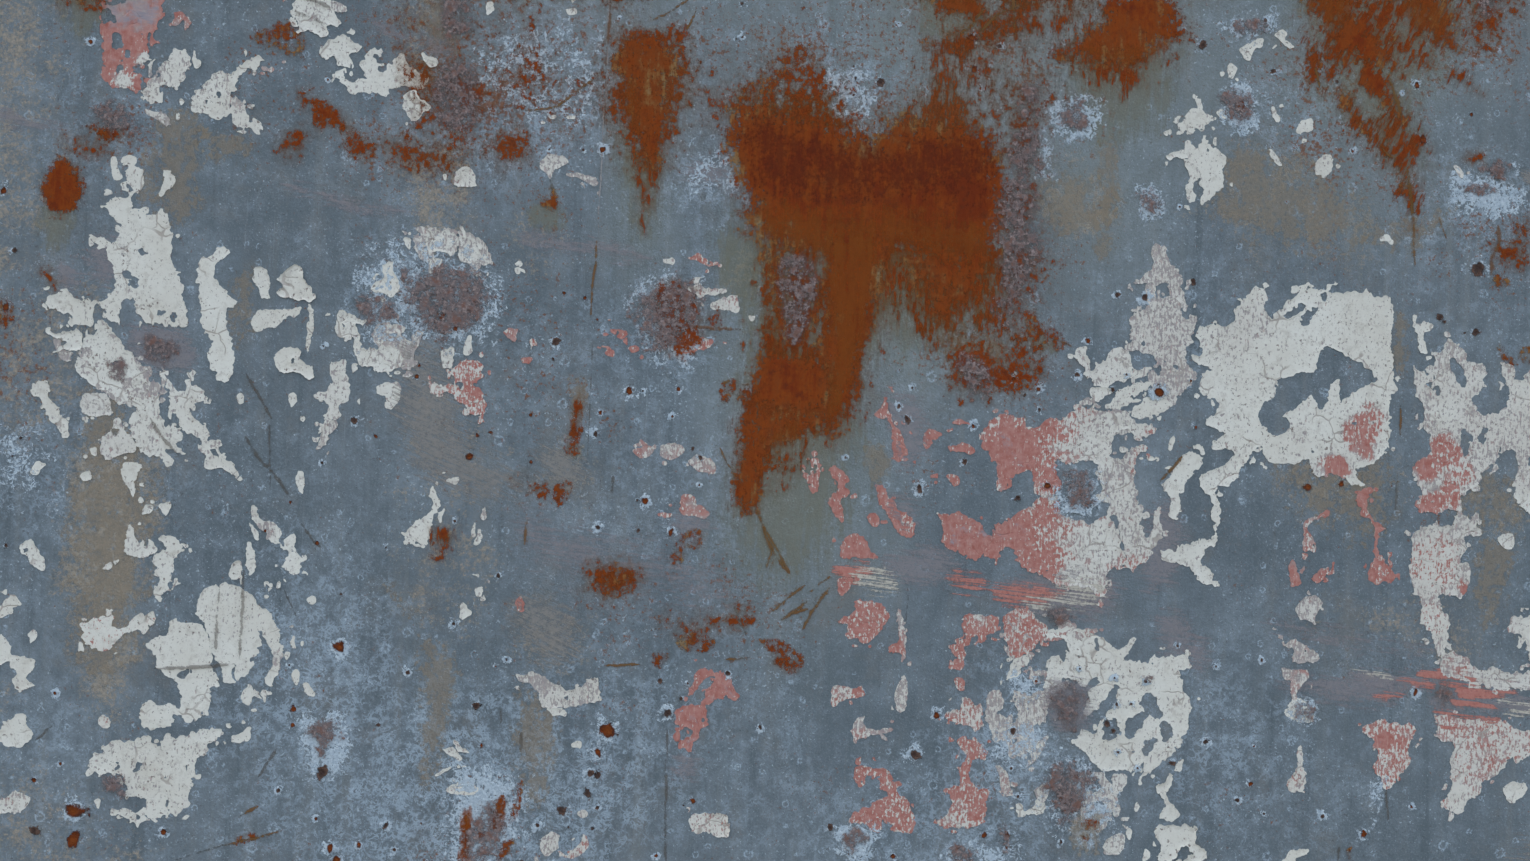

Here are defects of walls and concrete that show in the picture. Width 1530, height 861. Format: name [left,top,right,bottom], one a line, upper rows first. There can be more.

rust [34,99,138,220]
peeling [283,0,438,125]
peeling [1164,94,1233,211]
rust [1216,0,1527,231]
peeling [402,225,493,277]
rust [273,0,1198,574]
peeling [251,261,492,504]
peeling [3,539,45,571]
peeling [30,155,319,848]
peeling [383,472,487,551]
peeling [802,243,1530,861]
peeling [656,659,740,752]